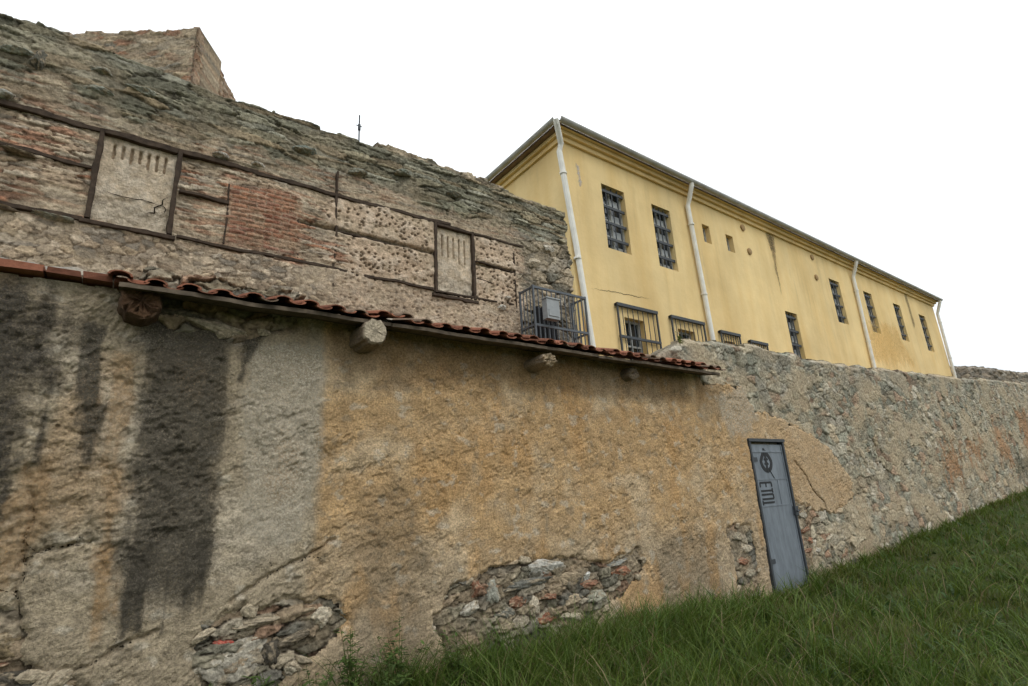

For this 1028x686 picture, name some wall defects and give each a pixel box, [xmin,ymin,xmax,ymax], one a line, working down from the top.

flaking render [726,523,761,601]
flaking render [795,501,856,576]
flaking render [0,608,77,686]
flaking render [190,597,346,686]
flaking render [433,548,646,658]